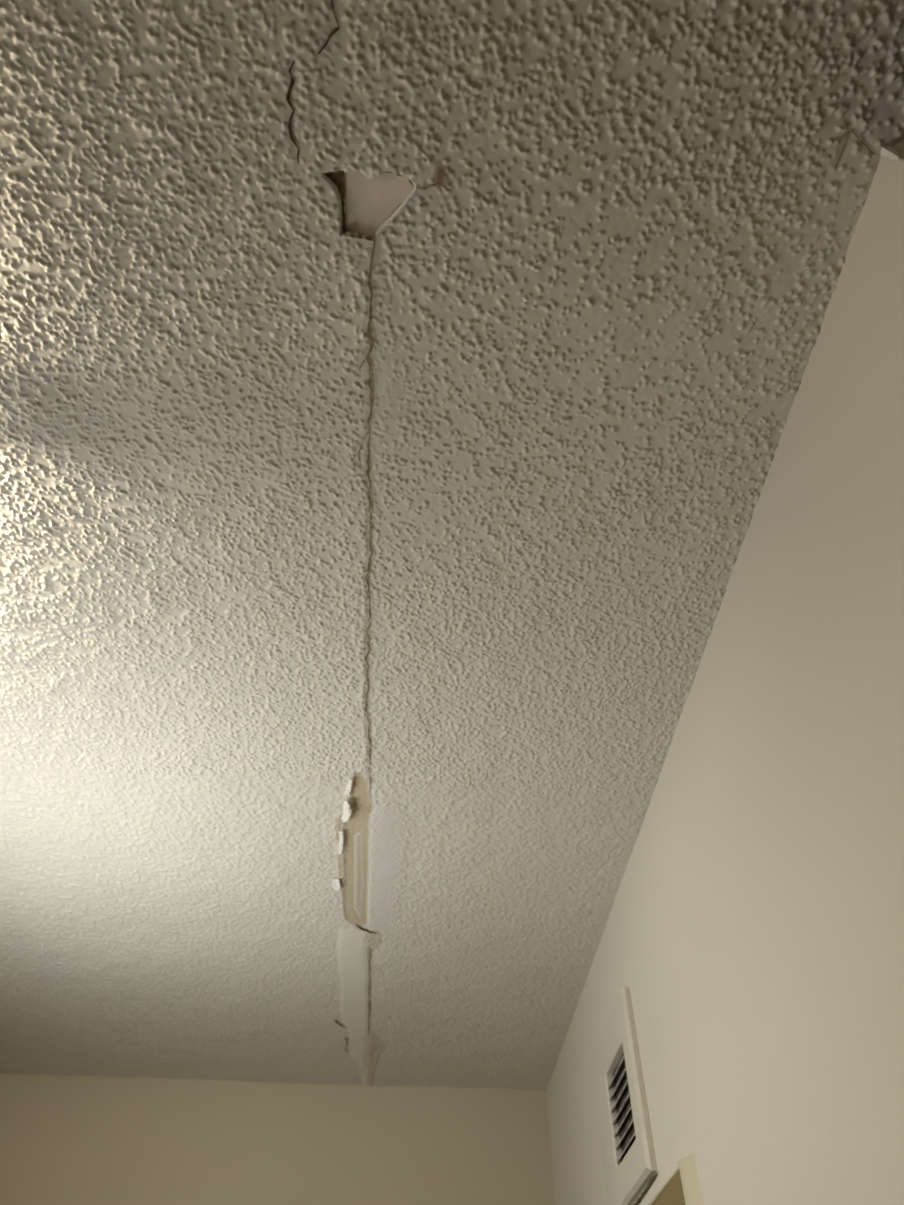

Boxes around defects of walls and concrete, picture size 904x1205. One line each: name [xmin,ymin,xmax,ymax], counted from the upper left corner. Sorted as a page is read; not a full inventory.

crack [286,0,340,165]
spalling [324,170,418,241]
crack [358,241,375,784]
peeling [335,924,387,1086]